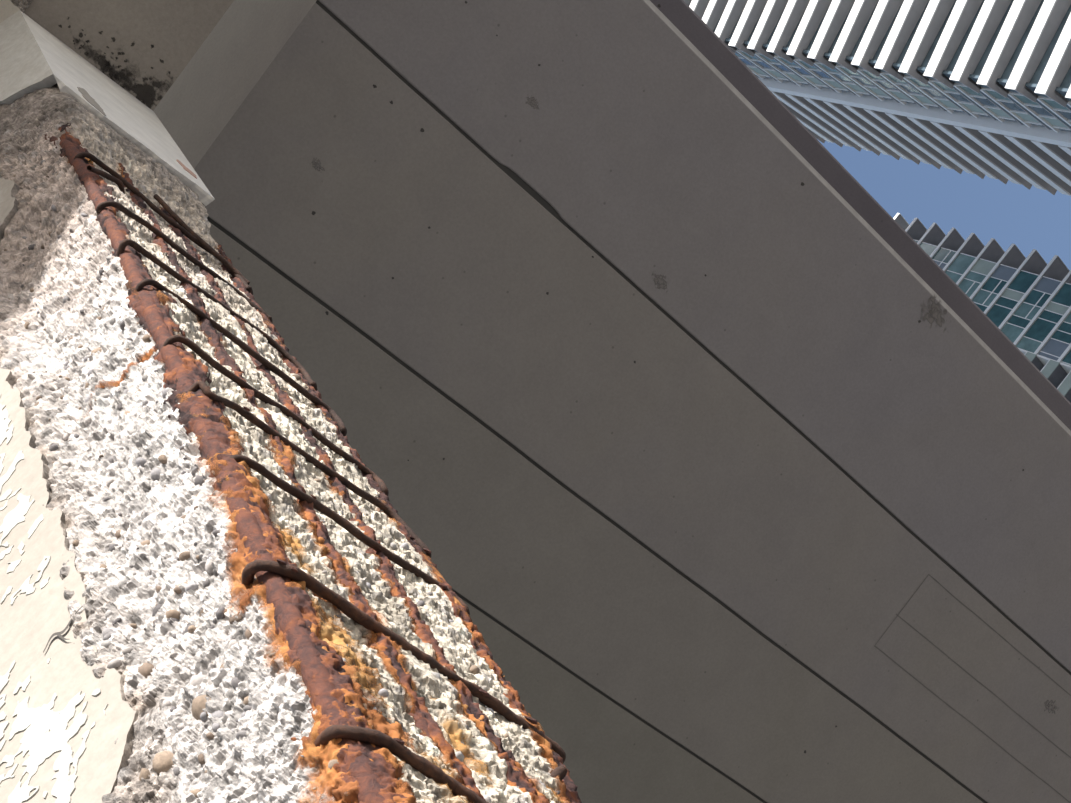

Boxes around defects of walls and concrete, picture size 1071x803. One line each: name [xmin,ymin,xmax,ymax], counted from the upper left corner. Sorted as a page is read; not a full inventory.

flaking render [10,0,33,13]
leakage [58,17,172,108]
rust [95,347,157,388]
spalling [0,84,582,803]
rust [206,416,416,803]
rust [410,535,476,635]
rust [425,656,499,803]
rust [485,655,570,803]